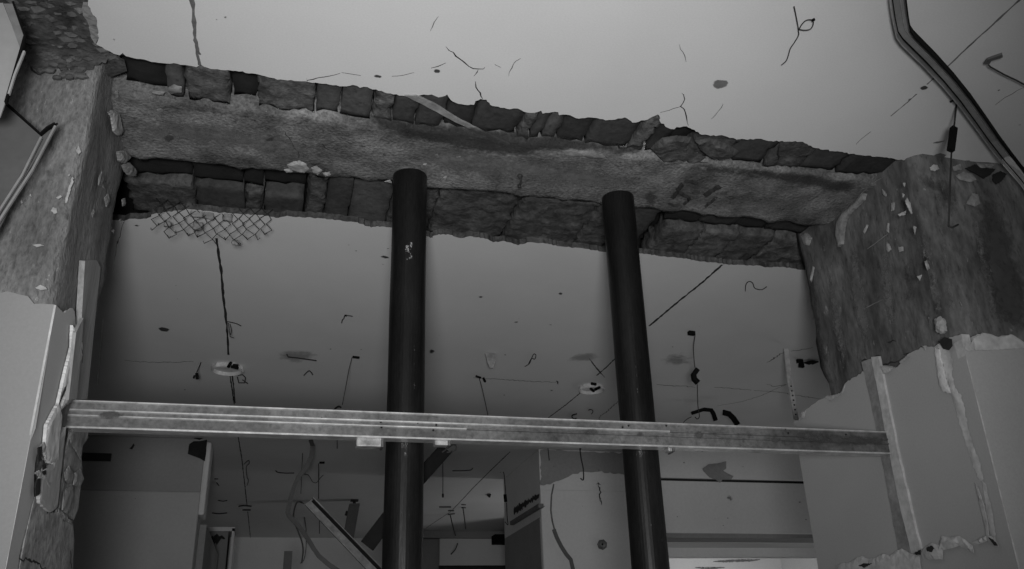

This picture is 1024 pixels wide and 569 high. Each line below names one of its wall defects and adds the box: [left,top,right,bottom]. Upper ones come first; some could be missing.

spalling [0,0,127,80]
crack [400,17,521,99]
flaking render [107,90,124,135]
spalling [51,174,74,214]
flaking render [116,150,137,176]
spalling [284,160,331,177]
spalling [651,135,739,168]
flaking render [835,193,867,247]
peeling [882,183,917,252]
flaking render [952,163,1007,207]
peeling [18,325,88,569]
spalling [835,316,1024,569]